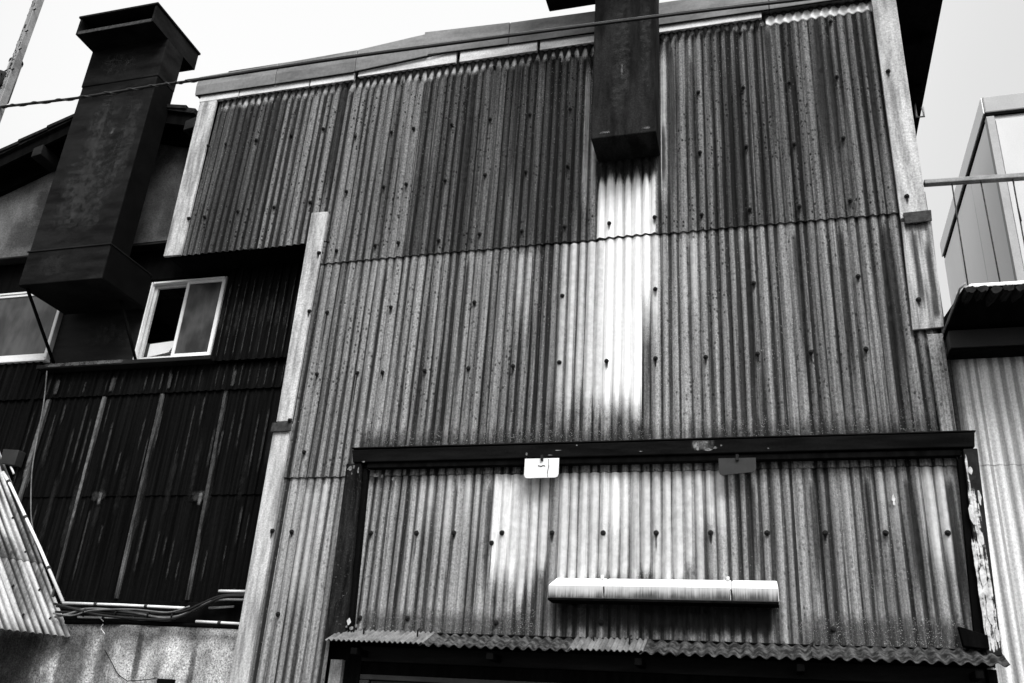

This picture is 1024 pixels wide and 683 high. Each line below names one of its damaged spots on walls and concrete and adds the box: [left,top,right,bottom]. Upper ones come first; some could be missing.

peeling [957,454,1000,651]